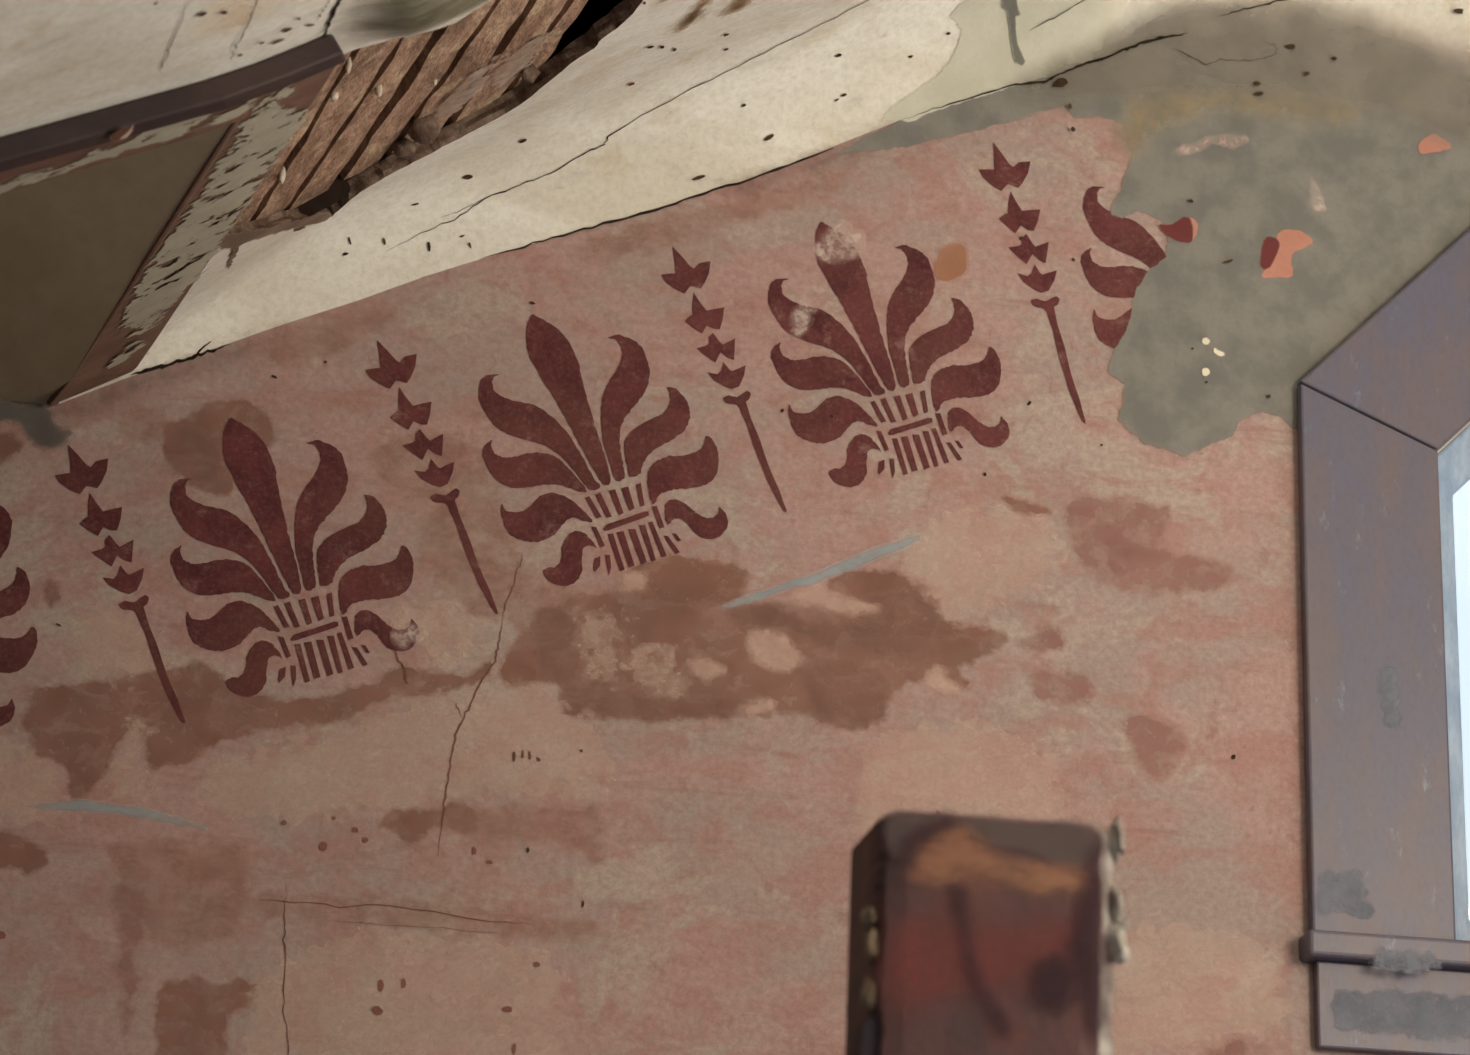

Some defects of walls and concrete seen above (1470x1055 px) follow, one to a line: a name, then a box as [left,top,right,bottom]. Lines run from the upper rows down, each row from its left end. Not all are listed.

peeling [0,0,643,369]
crack [389,0,868,258]
damp [676,0,752,33]
peeling [834,0,1470,456]
damp [1004,497,1230,593]
crack [438,553,523,852]
damp [22,554,1006,798]